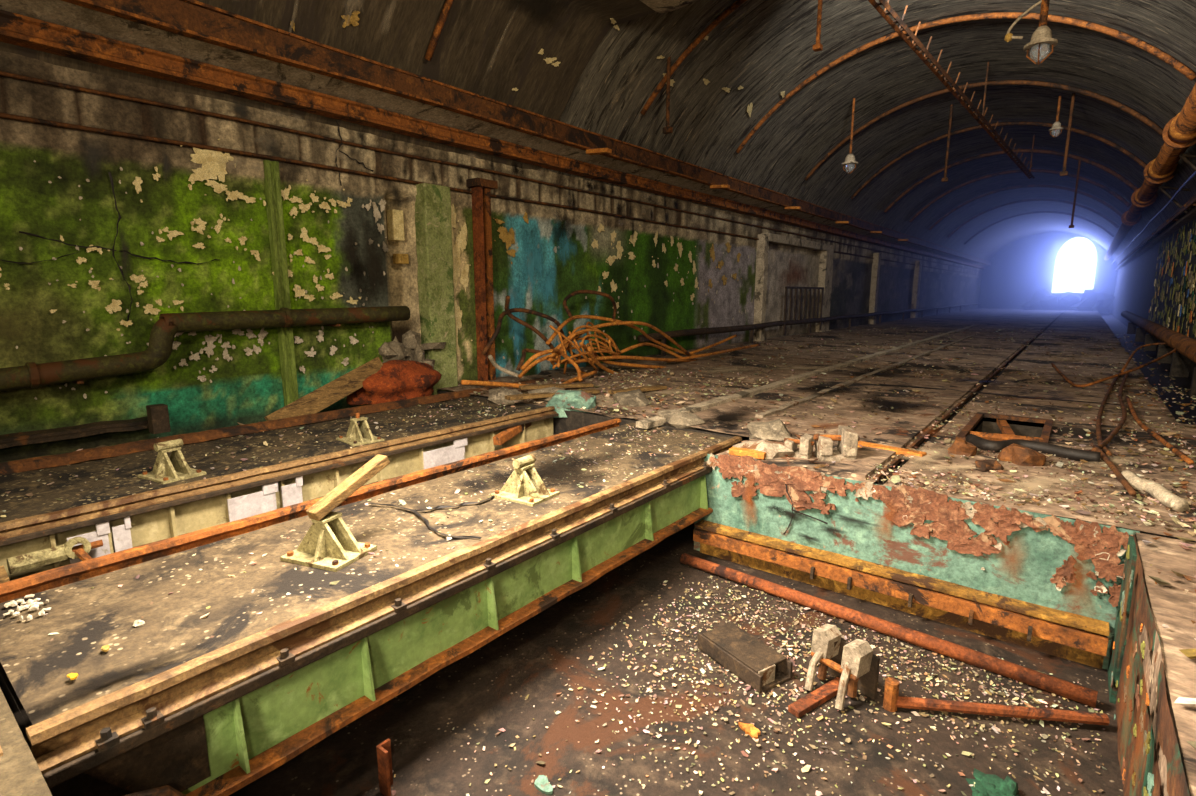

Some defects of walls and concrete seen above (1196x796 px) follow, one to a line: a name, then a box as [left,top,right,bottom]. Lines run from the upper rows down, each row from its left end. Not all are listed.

crack [1,172,220,322]
peeling [48,235,184,344]
peeling [119,166,160,202]
peeling [140,139,266,311]
peeling [172,328,270,383]
peeling [272,179,388,307]
peeling [294,326,374,373]
leakage [345,231,388,297]
leakage [510,292,522,360]
leakage [557,181,634,260]
spalling [694,453,1190,796]